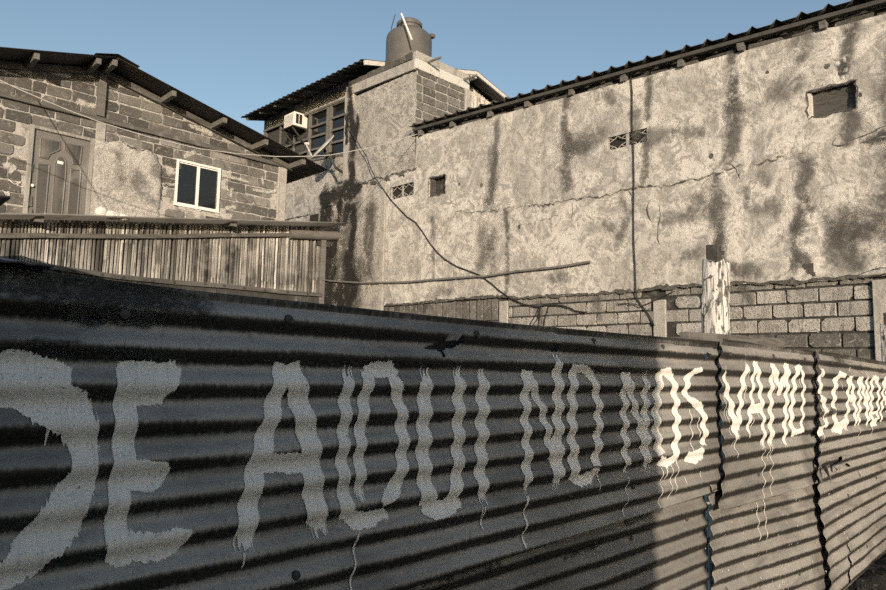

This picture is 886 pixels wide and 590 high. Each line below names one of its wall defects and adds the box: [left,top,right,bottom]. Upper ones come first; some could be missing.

damp [840,18,859,74]
damp [318,83,374,308]
damp [561,94,572,192]
crack [448,155,780,225]
damp [723,52,742,161]
damp [710,175,759,277]
damp [790,159,815,271]
damp [841,109,860,145]
damp [828,183,886,271]
damp [866,132,886,144]